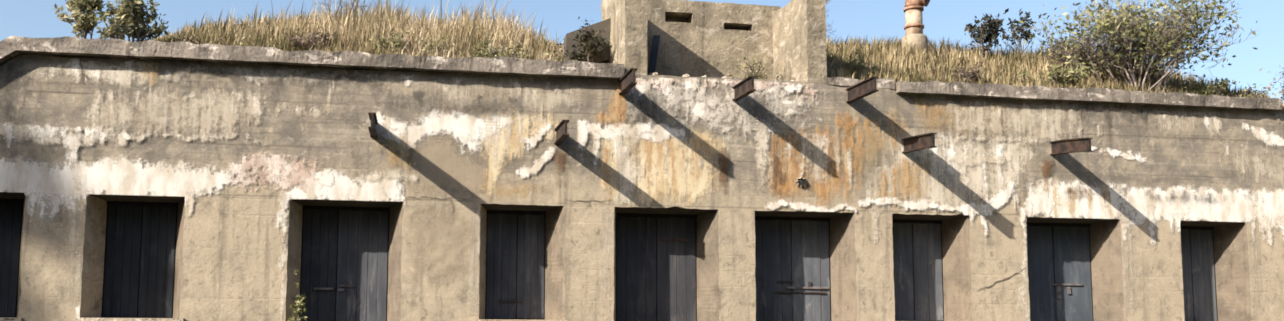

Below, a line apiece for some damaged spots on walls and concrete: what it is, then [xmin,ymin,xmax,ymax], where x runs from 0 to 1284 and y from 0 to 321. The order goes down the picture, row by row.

peeling [229,153,319,193]
rust [768,113,906,203]